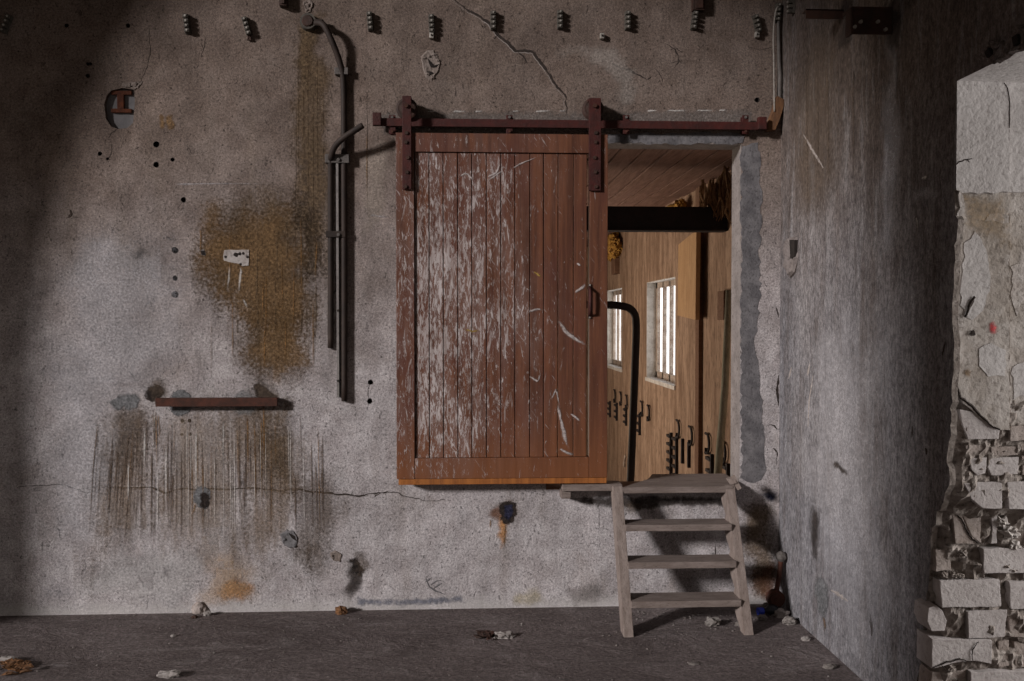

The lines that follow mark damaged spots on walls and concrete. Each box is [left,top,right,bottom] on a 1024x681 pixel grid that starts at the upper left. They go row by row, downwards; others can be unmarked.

crack [452,0,567,114]
corrosion [196,190,327,383]
crack [17,484,445,502]
corrosion [490,501,517,545]
flaking render [914,191,1024,681]